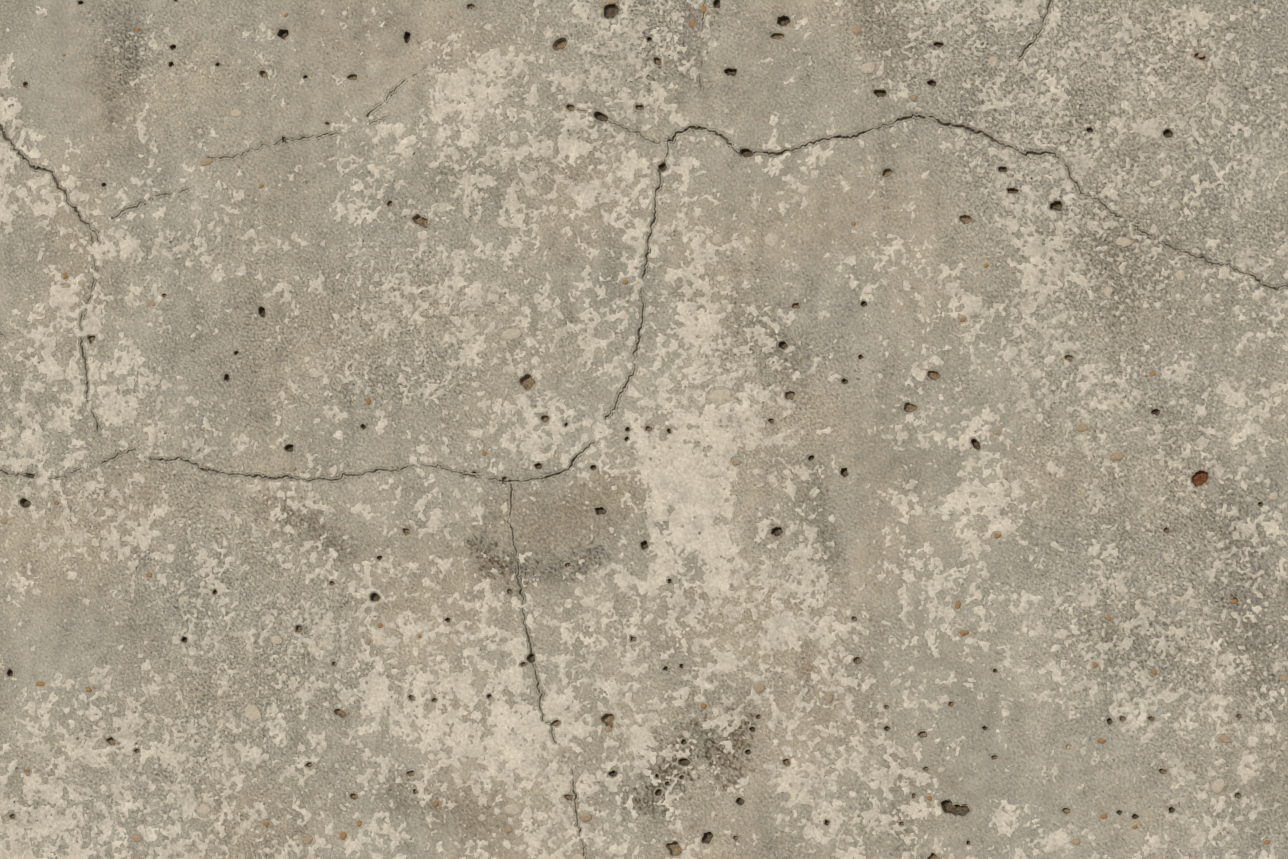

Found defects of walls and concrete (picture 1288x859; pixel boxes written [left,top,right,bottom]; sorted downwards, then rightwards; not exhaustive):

crack [1006,0,1054,83]
crack [209,53,451,161]
crack [113,185,196,220]
crack [0,123,102,440]
crack [0,448,135,481]
crack [152,98,1288,859]